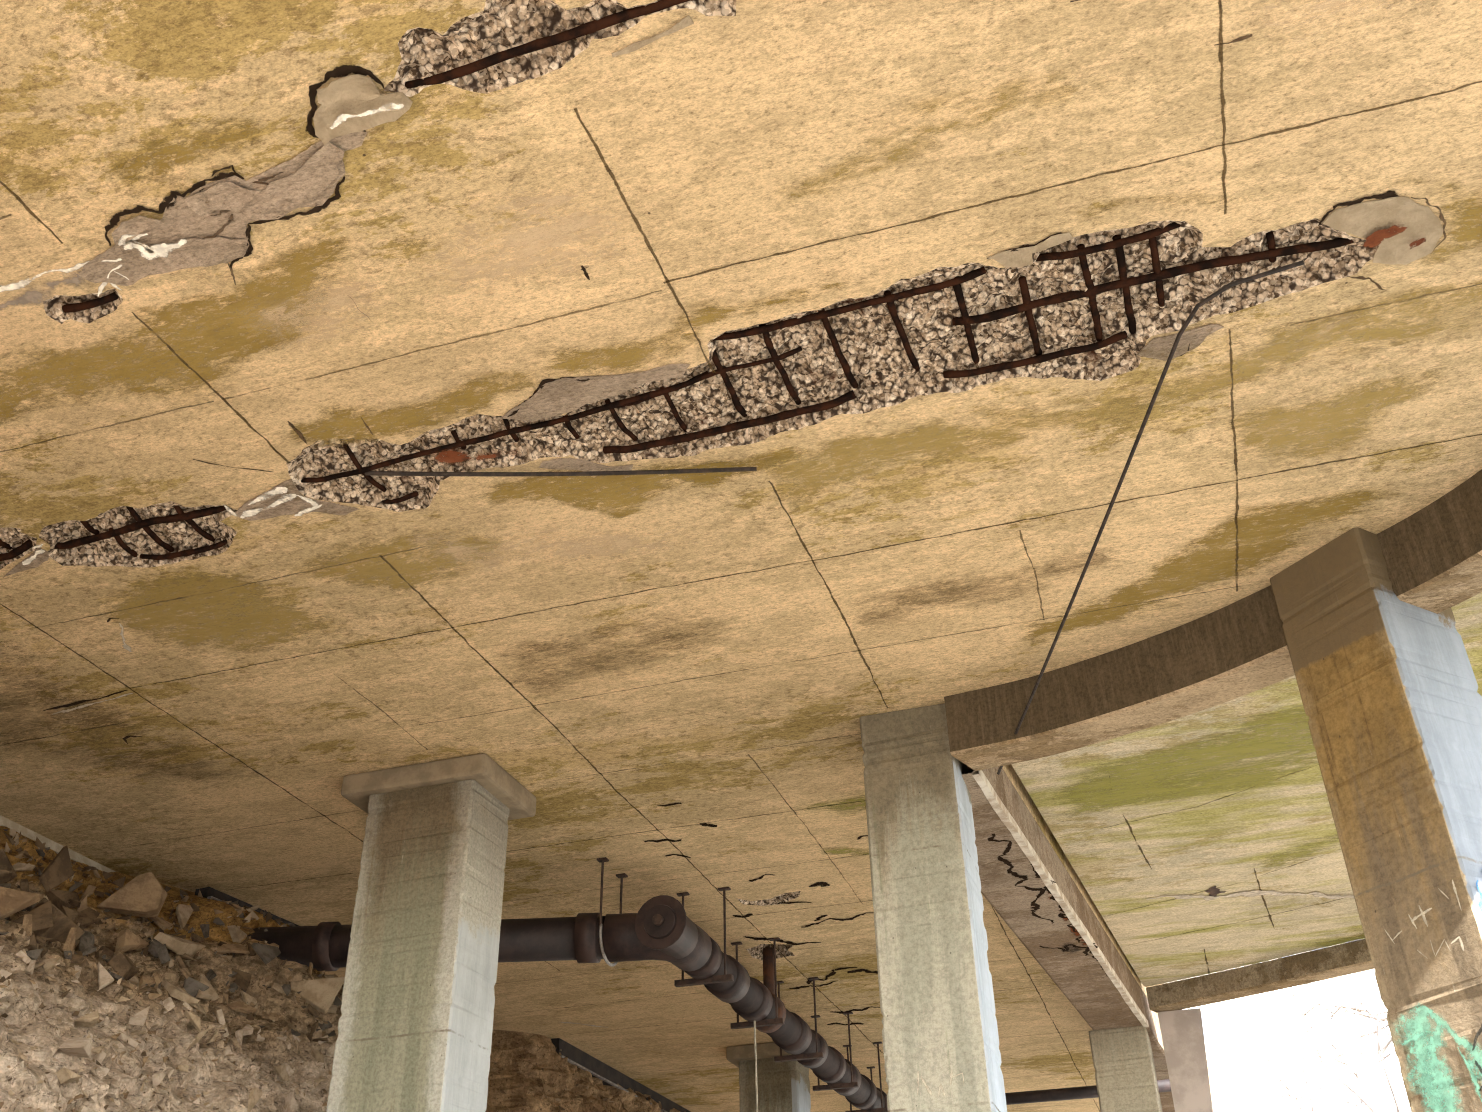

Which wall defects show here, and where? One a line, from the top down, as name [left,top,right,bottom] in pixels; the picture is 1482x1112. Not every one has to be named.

spalling [317,0,736,108]
crack [1214,34,1253,46]
peeling [43,131,367,324]
rust [1363,225,1426,249]
water stain [0,237,345,426]
spalling [0,191,1447,578]
water stain [108,573,334,651]
crack [988,834,1108,976]